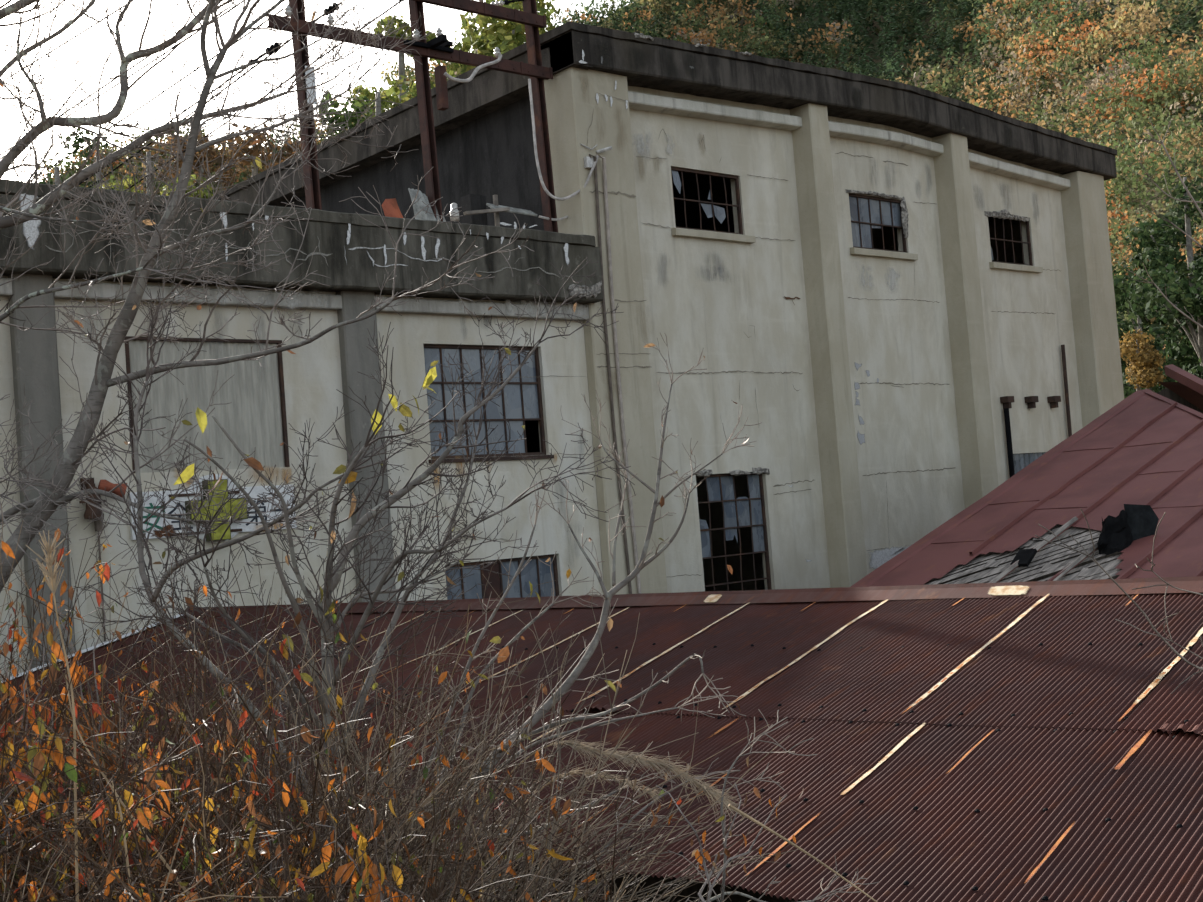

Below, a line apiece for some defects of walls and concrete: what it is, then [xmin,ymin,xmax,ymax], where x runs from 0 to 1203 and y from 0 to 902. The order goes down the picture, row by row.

leakage [579,44,609,64]
leakage [0,193,41,250]
leakage [220,212,269,261]
leakage [332,223,351,255]
corrosion [382,198,403,218]